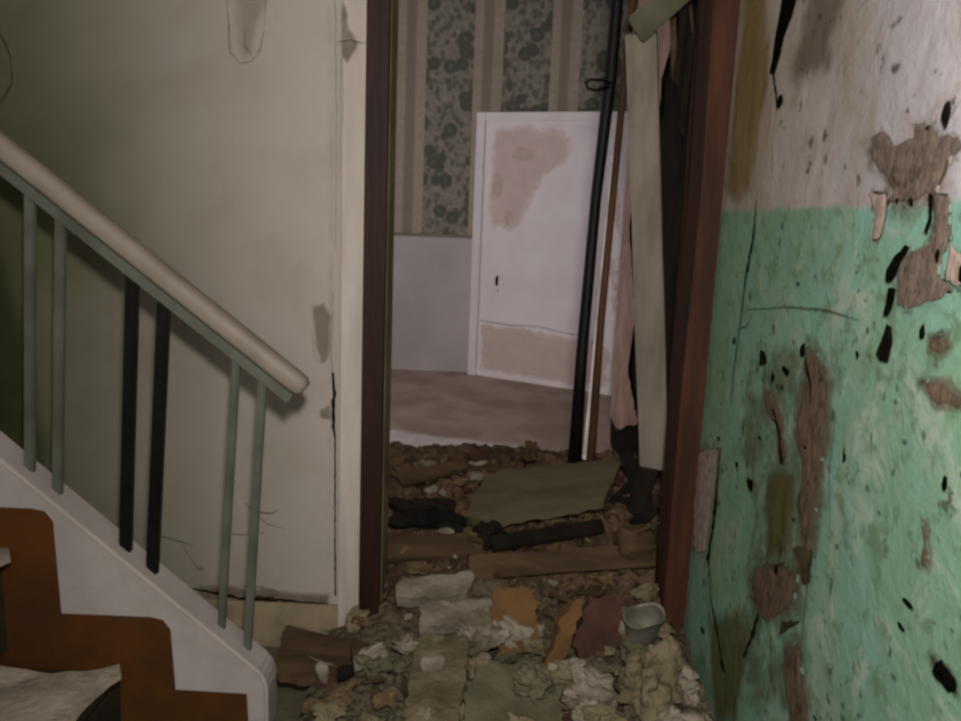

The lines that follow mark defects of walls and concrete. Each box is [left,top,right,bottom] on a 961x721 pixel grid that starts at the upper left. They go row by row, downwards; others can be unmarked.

peeling [492,130,566,225]
peeling [868,101,961,362]
peeling [481,320,608,385]
peeling [918,378,961,409]
crack [142,372,336,605]
peeling [759,340,832,555]
peeling [743,561,800,658]
peeling [783,641,828,721]